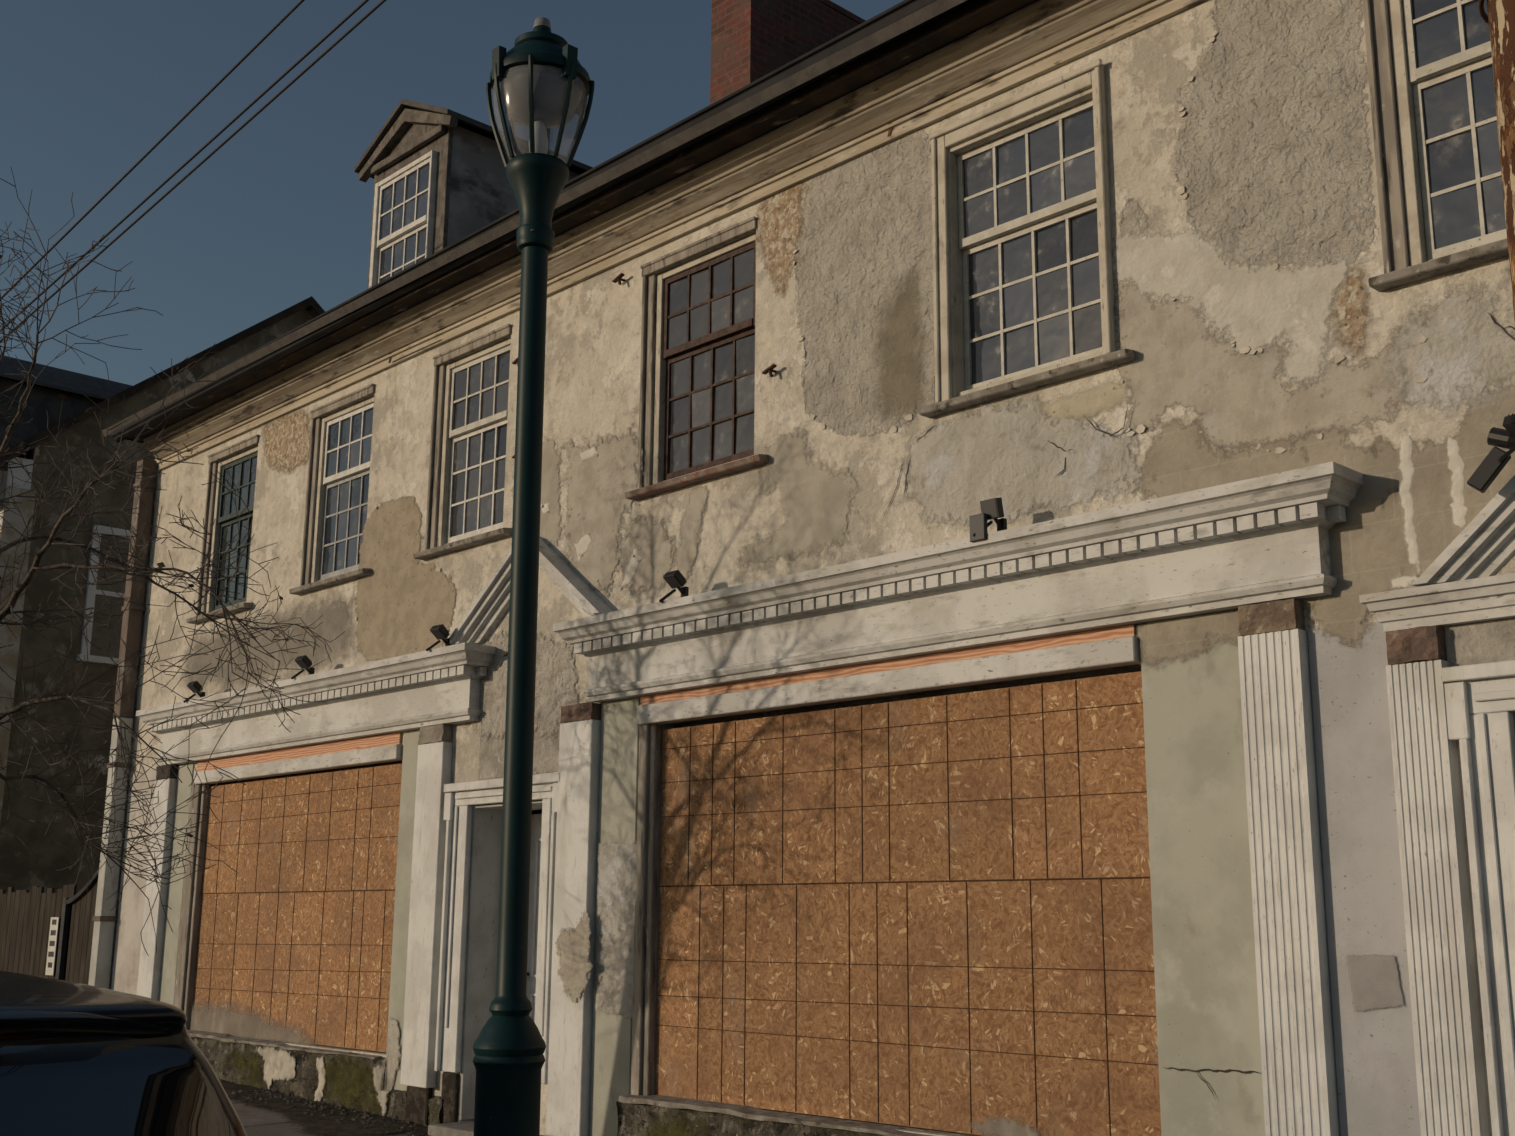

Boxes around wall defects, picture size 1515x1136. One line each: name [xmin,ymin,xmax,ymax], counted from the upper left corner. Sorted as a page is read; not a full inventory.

flaking render [738,129,935,574]
flaking render [261,410,311,474]
flaking render [328,496,457,661]
leakage [1391,435,1421,588]
leakage [1447,436,1468,528]
crack [1163,1067,1258,1100]